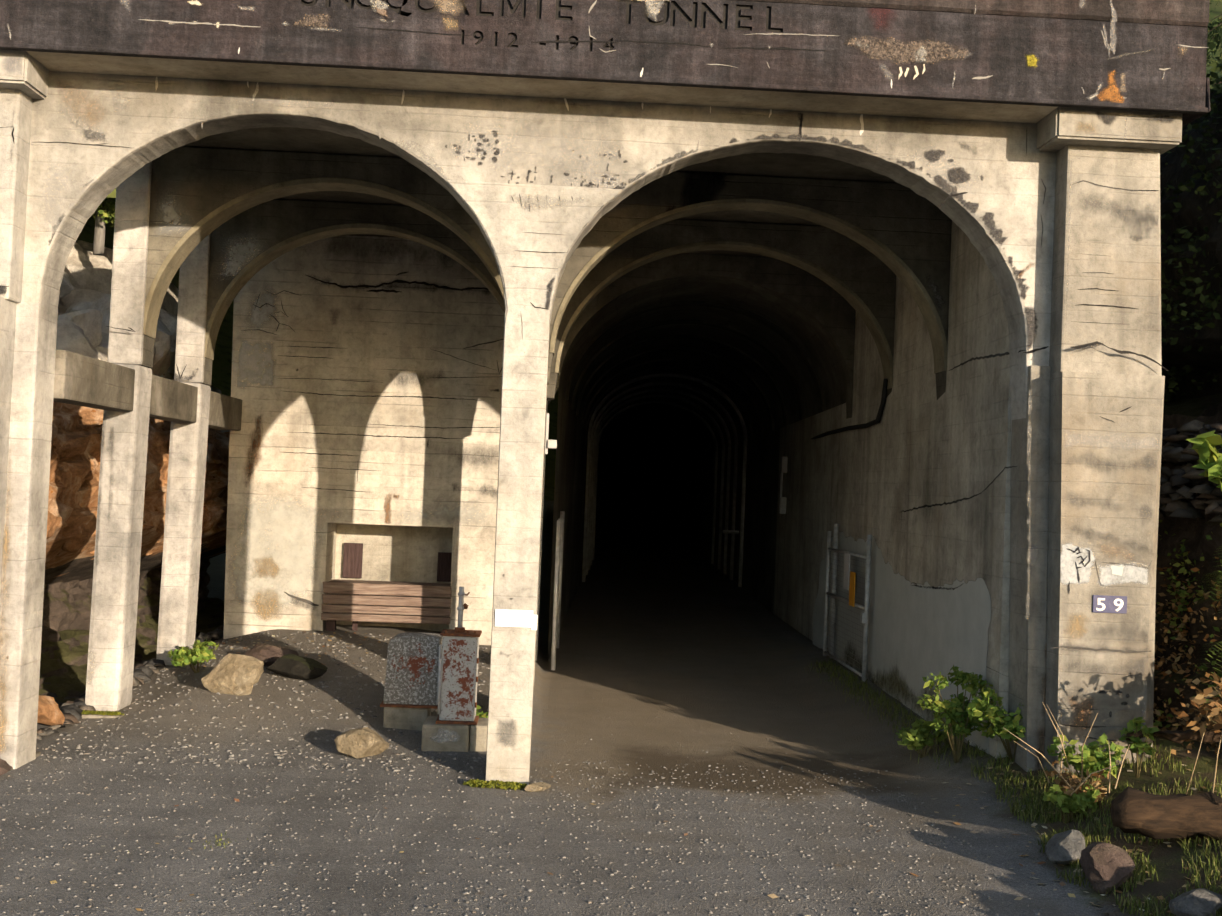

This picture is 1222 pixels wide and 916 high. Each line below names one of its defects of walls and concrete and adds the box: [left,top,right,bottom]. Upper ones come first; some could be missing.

spalling [847,37,969,80]
peeling [394,140,447,179]
spalling [445,131,499,165]
spalling [501,150,645,210]
peeling [729,134,871,152]
peeling [897,150,1007,244]
spalling [1009,256,1038,349]
crack [949,254,1168,371]
crack [241,232,568,492]
rust [247,416,261,478]
crack [903,466,1017,512]